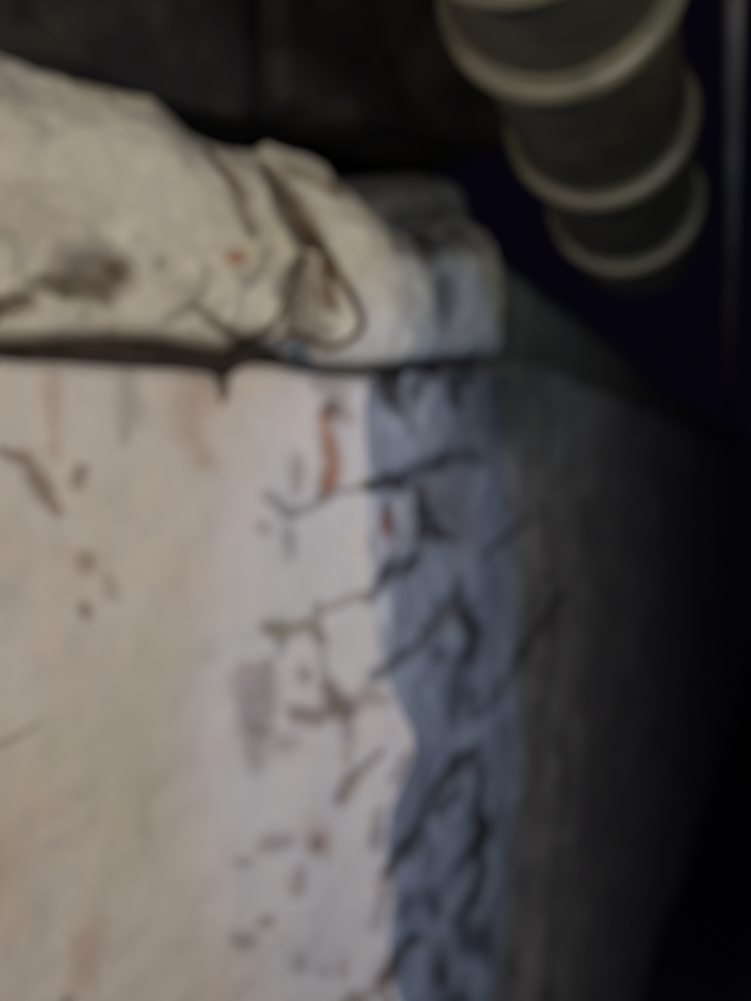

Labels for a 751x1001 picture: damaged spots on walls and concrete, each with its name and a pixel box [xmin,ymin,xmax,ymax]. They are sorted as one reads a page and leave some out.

crack [207,148,256,236]
crack [0,290,471,404]
crack [0,449,57,512]
rust [320,411,339,501]
crack [364,450,482,490]
crack [347,551,422,601]
crack [264,624,319,637]
crack [383,746,484,877]
crack [380,935,422,983]